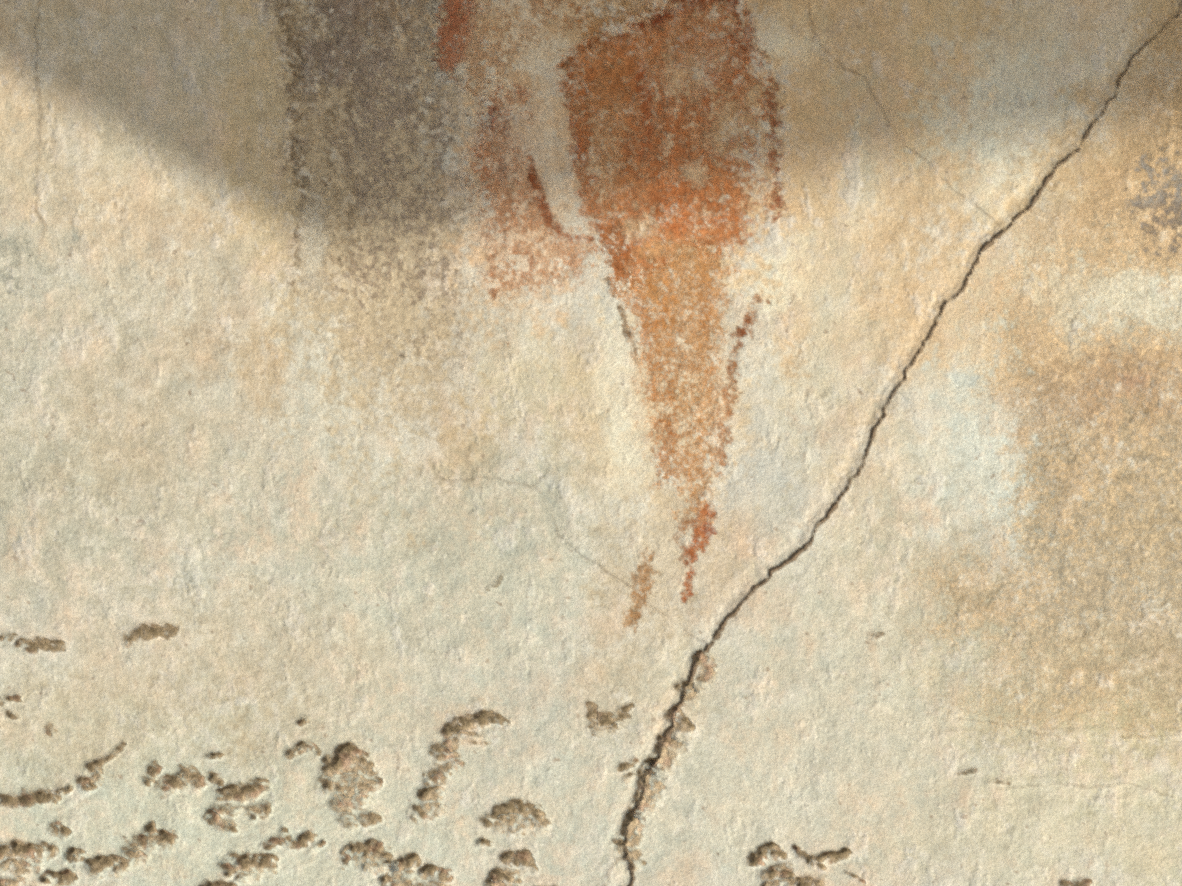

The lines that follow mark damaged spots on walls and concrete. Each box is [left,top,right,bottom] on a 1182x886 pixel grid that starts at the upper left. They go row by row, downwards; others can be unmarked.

crack [612,14,1179,886]
spalling [0,633,65,653]
spalling [123,623,178,647]
spalling [0,742,126,808]
spalling [0,820,178,886]
spalling [143,753,271,832]
spalling [201,827,325,886]
spalling [286,741,453,886]
spalling [411,710,509,823]
spalling [485,849,538,886]
spalling [480,799,550,846]
spalling [748,842,852,886]